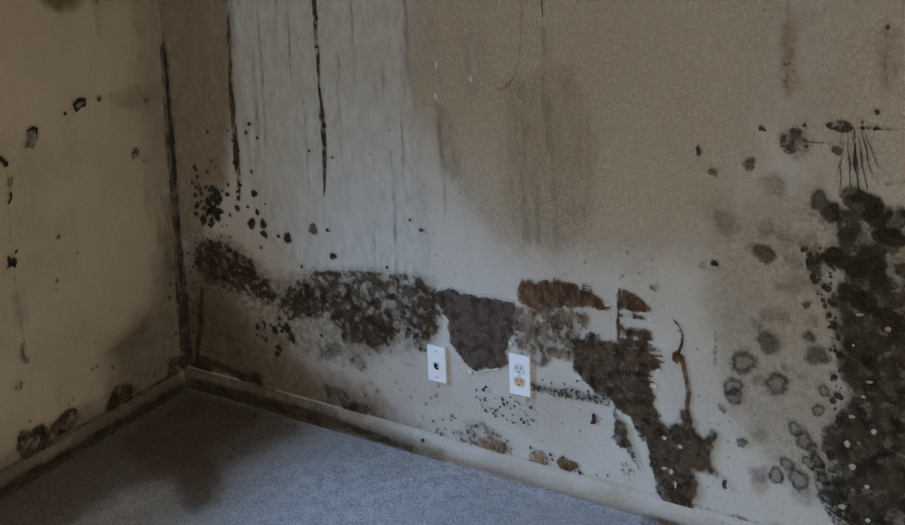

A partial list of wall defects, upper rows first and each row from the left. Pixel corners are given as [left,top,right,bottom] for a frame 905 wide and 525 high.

water stain [414,0,774,253]
water stain [0,0,440,525]
water stain [711,0,905,525]
water stain [432,415,512,454]
water stain [475,386,534,425]
peeling [434,277,717,508]